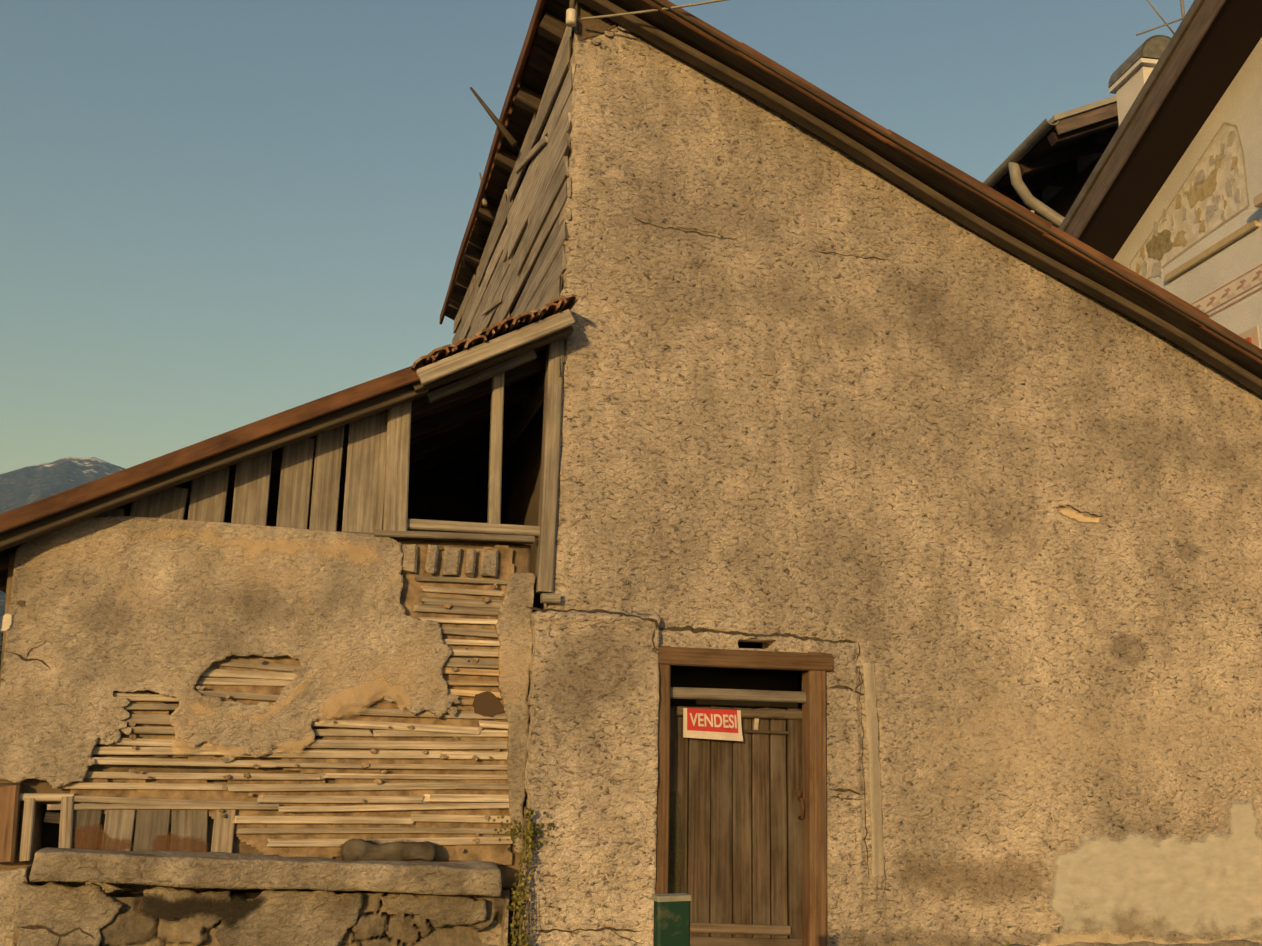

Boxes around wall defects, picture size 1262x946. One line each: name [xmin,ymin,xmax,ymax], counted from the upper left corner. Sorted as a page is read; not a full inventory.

crack [631,216,737,239]
crack [817,251,888,260]
spalling [1056,505,1103,523]
spalling [1,600,24,631]
crack [9,644,50,668]
peeling [46,544,514,865]
crack [526,606,886,896]